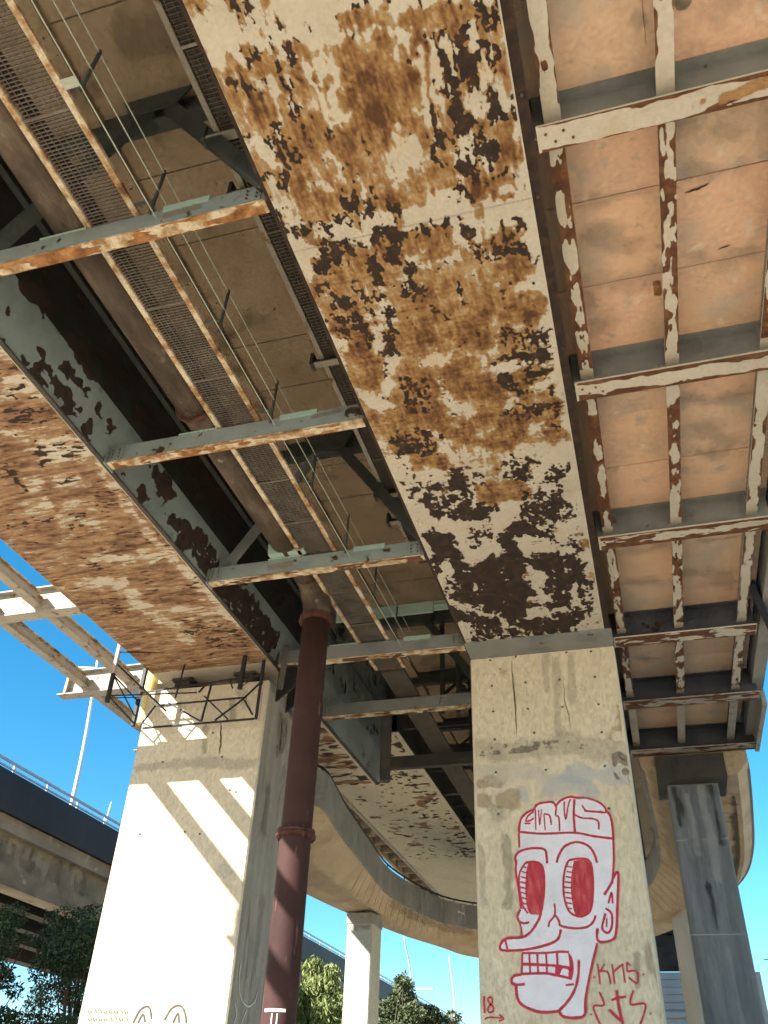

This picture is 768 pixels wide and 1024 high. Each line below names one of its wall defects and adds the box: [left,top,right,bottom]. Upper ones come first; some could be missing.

spalling [673,0,692,10]
corrosion [0,0,571,537]
peeling [0,329,117,468]
peeling [142,423,179,441]
peeling [6,454,280,662]
corrosion [0,353,340,674]
corrosion [333,556,423,572]
peeling [388,427,596,642]
crack [510,660,518,735]
corrosion [318,707,447,784]
spalling [480,740,584,756]
corrosion [406,795,436,808]